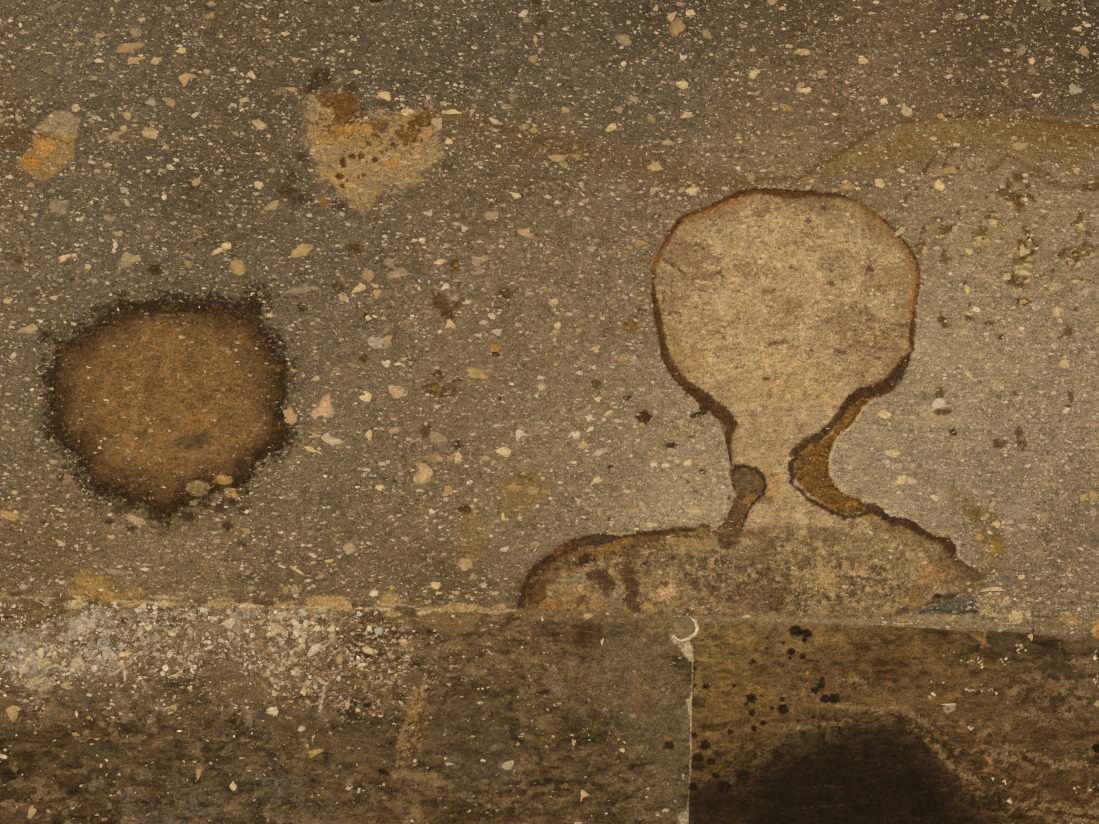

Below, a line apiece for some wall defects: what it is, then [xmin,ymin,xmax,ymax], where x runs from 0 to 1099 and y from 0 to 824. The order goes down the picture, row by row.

spalling [361,310,376,325]
spalling [386,174,1099,824]
leakage [893,584,1058,705]